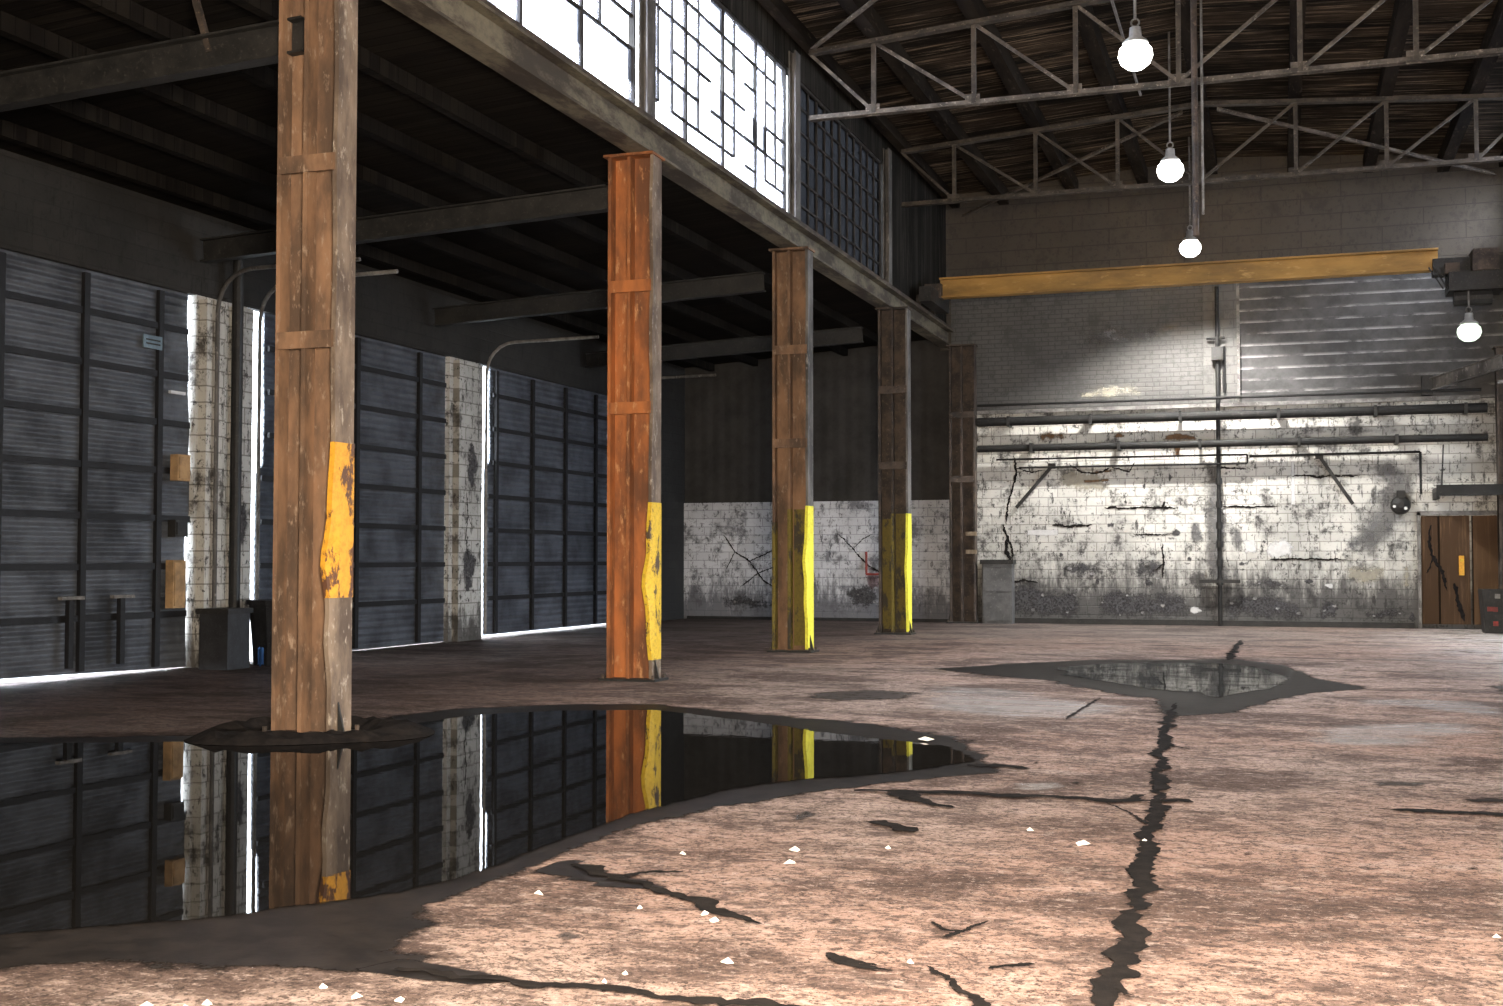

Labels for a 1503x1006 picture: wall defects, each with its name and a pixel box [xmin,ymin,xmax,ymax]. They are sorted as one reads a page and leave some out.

peeling [1015,553,1190,619]
peeling [1223,577,1338,619]
leakage [811,690,918,701]
leakage [934,659,1365,716]
crack [1378,808,1503,816]
leakage [0,704,1001,984]
crack [854,703,1194,1006]
crack [571,863,762,924]
crack [395,967,801,1006]
crack [826,952,888,970]